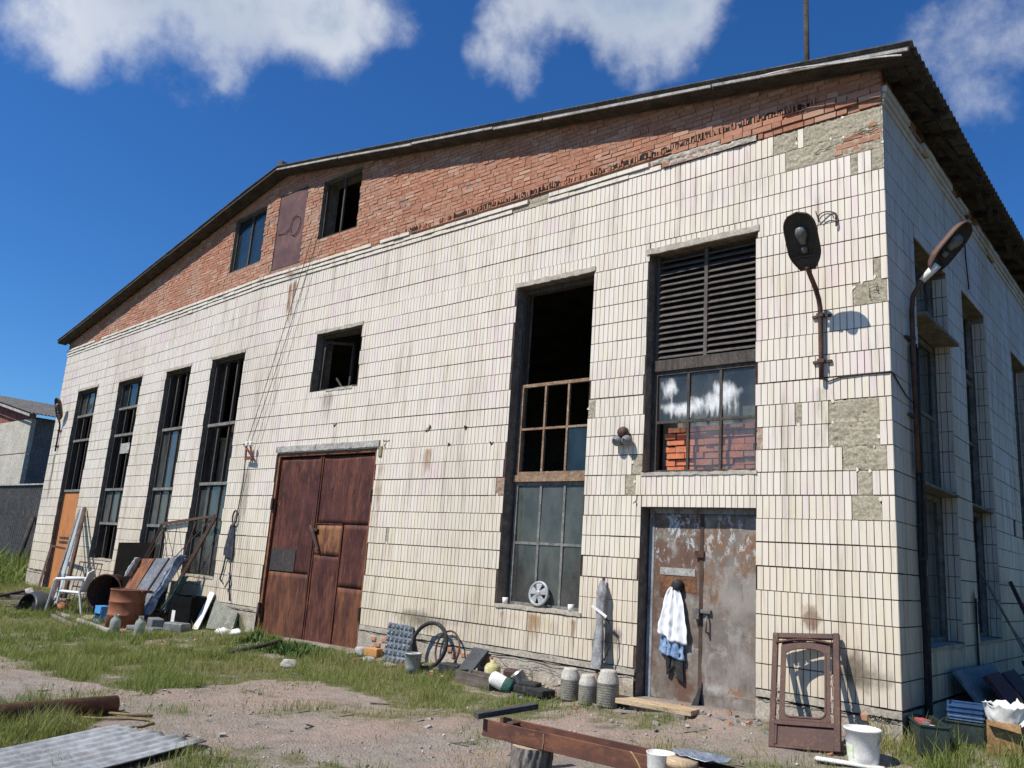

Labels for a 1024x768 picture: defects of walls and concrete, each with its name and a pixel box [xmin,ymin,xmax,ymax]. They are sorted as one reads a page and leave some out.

spalling [773,106,884,175]
peeling [852,257,888,306]
peeling [829,397,887,520]